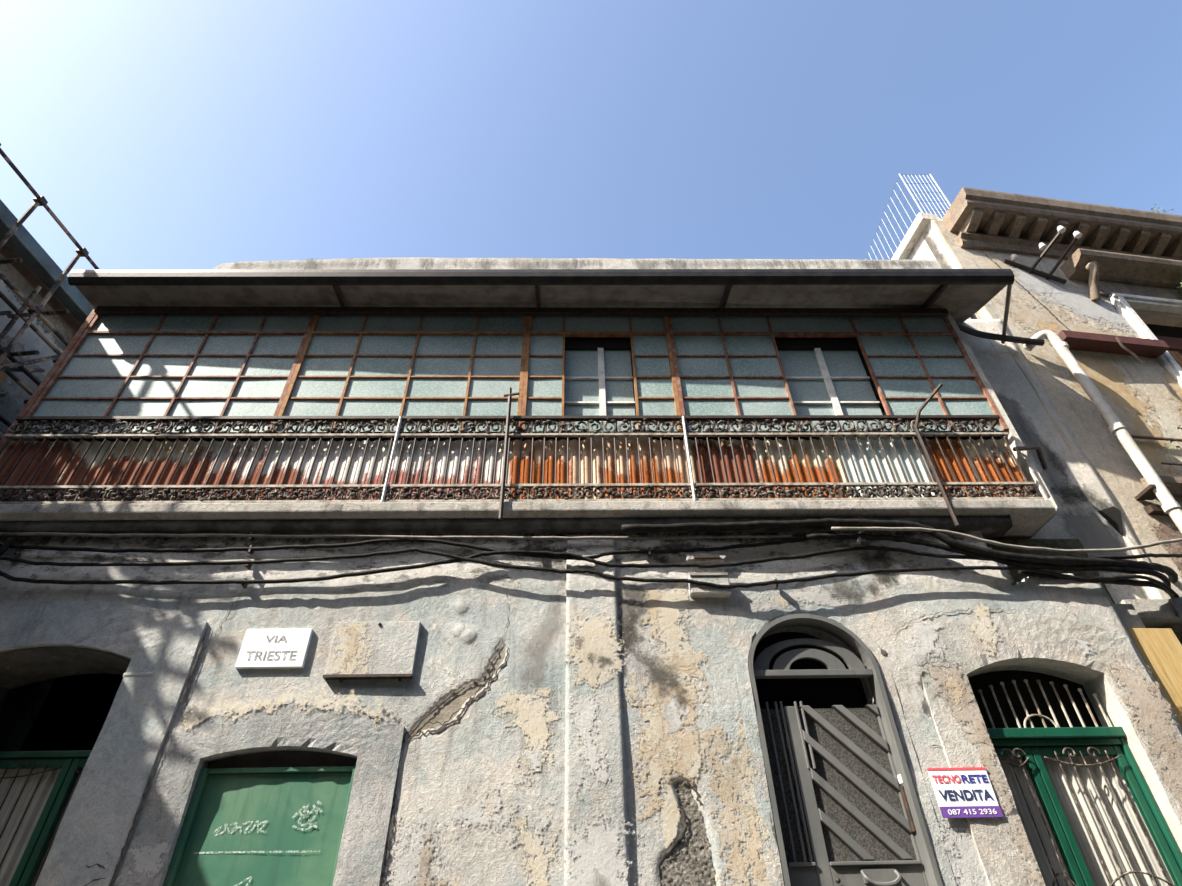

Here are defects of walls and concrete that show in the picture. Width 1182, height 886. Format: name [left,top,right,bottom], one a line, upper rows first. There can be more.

corrosion [0,441,573,502]
corrosion [598,439,848,499]
corrosion [919,438,1031,497]
peeling [179,621,404,732]
water stain [619,585,687,706]
crack [381,589,509,886]
peeling [380,583,784,886]